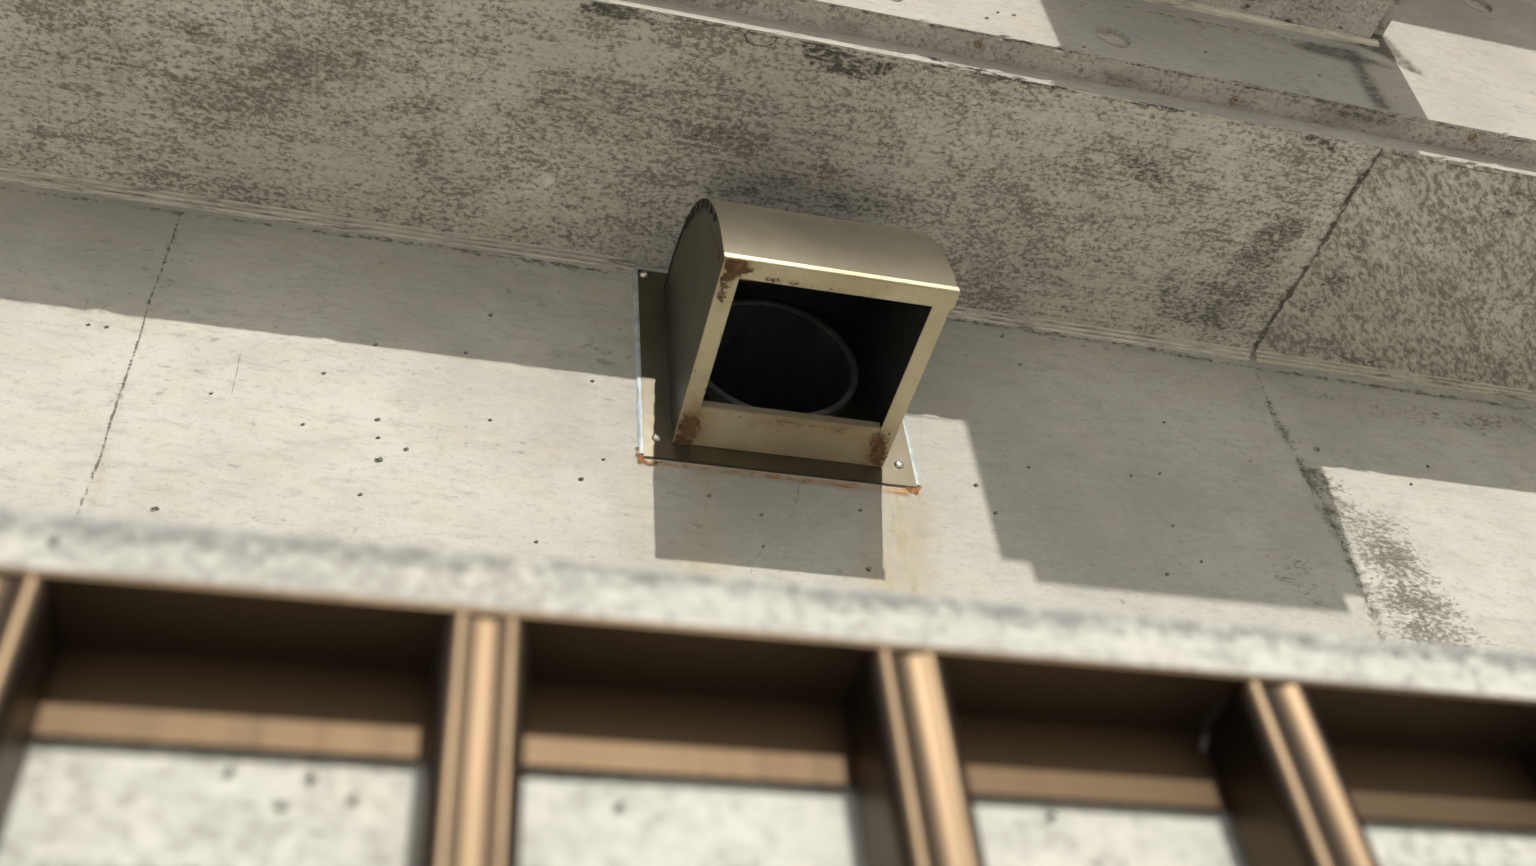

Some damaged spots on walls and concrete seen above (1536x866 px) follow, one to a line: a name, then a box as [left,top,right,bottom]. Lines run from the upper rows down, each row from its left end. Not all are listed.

crack [77,214,180,513]
leakage [0,506,518,569]
leakage [551,401,1536,671]
crack [1253,148,1383,639]